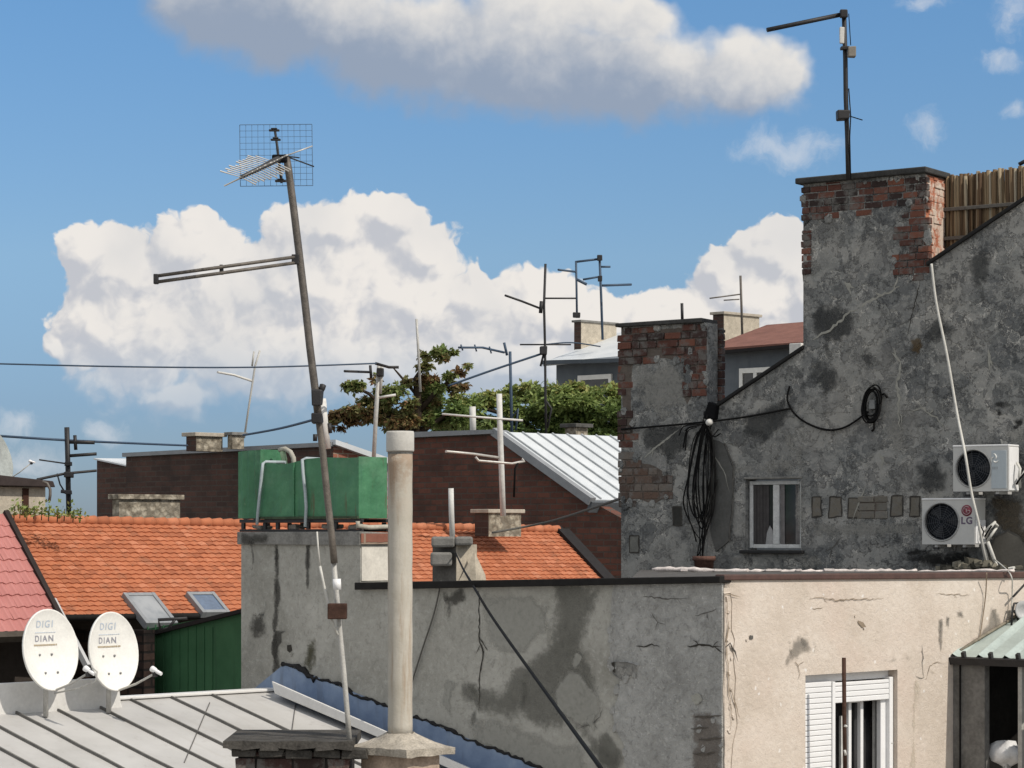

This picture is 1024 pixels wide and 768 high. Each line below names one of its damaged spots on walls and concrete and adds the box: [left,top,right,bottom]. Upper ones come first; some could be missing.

spalling [800,174,932,282]
spalling [617,322,709,526]
leakage [253,545,282,672]
leakage [444,589,464,609]
crack [476,591,487,711]
leakage [463,586,594,725]
crack [638,596,721,652]
crack [810,597,882,609]
leakage [580,724,621,768]